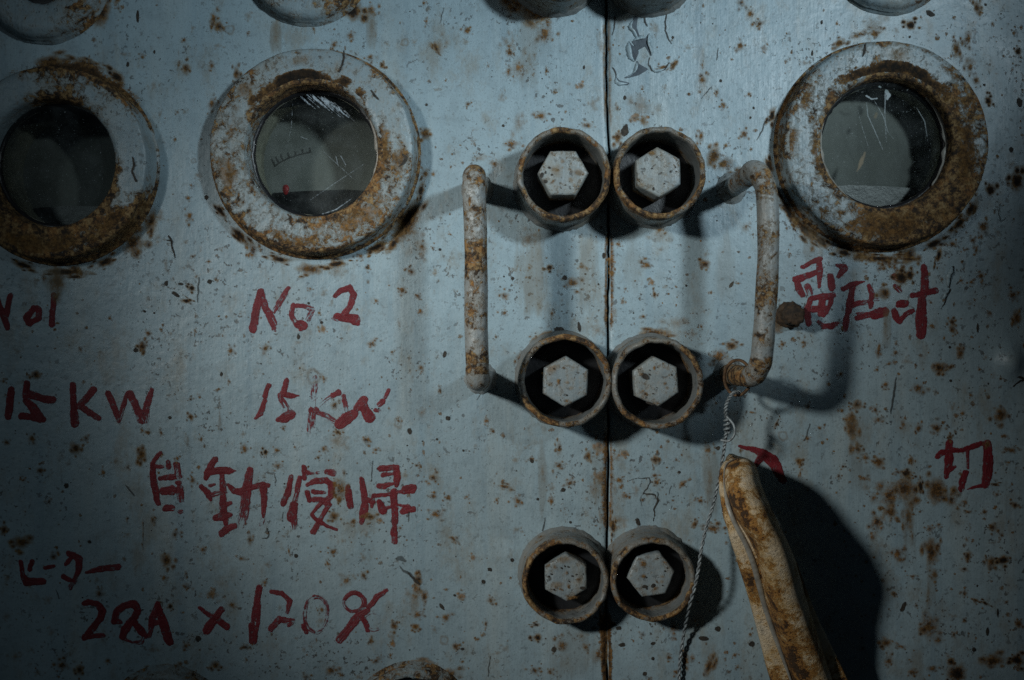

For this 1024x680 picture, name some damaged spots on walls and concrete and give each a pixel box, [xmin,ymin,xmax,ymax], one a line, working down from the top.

rust [31,38,142,112]
rust [232,64,366,107]
peeling [612,16,670,100]
rust [777,16,1024,298]
rust [12,214,155,306]
rust [214,167,434,291]
rust [893,368,1024,470]
rust [833,394,1024,642]